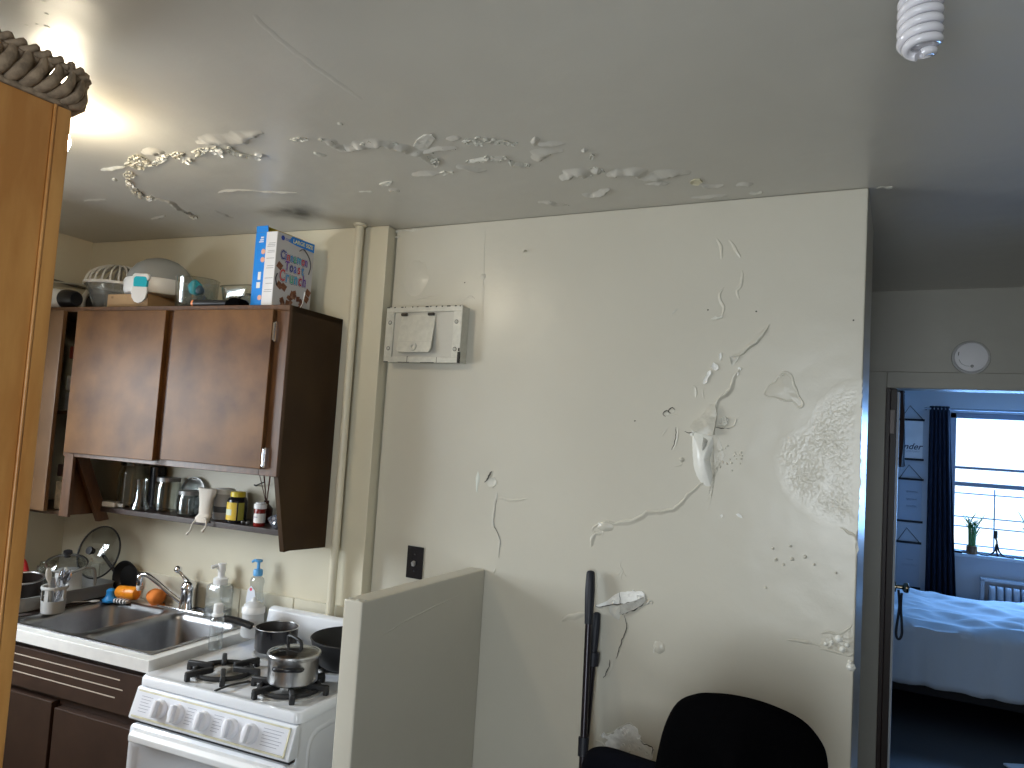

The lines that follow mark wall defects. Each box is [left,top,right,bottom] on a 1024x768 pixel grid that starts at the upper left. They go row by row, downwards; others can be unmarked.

peeling [124,130,264,202]
crack [491,492,528,573]
spalling [596,590,653,679]